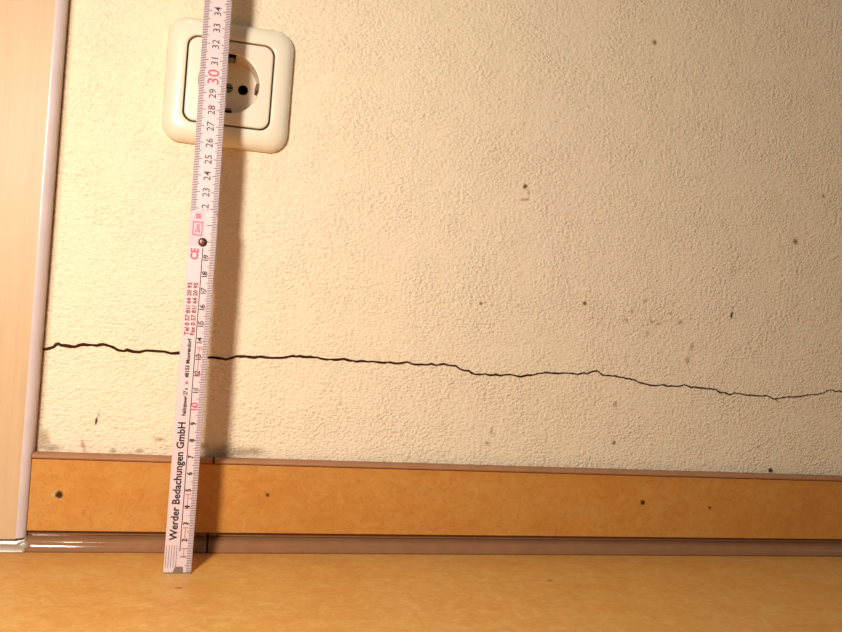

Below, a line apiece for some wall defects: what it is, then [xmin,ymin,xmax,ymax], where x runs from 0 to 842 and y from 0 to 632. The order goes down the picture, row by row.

crack [43,342,180,355]
crack [207,355,842,403]